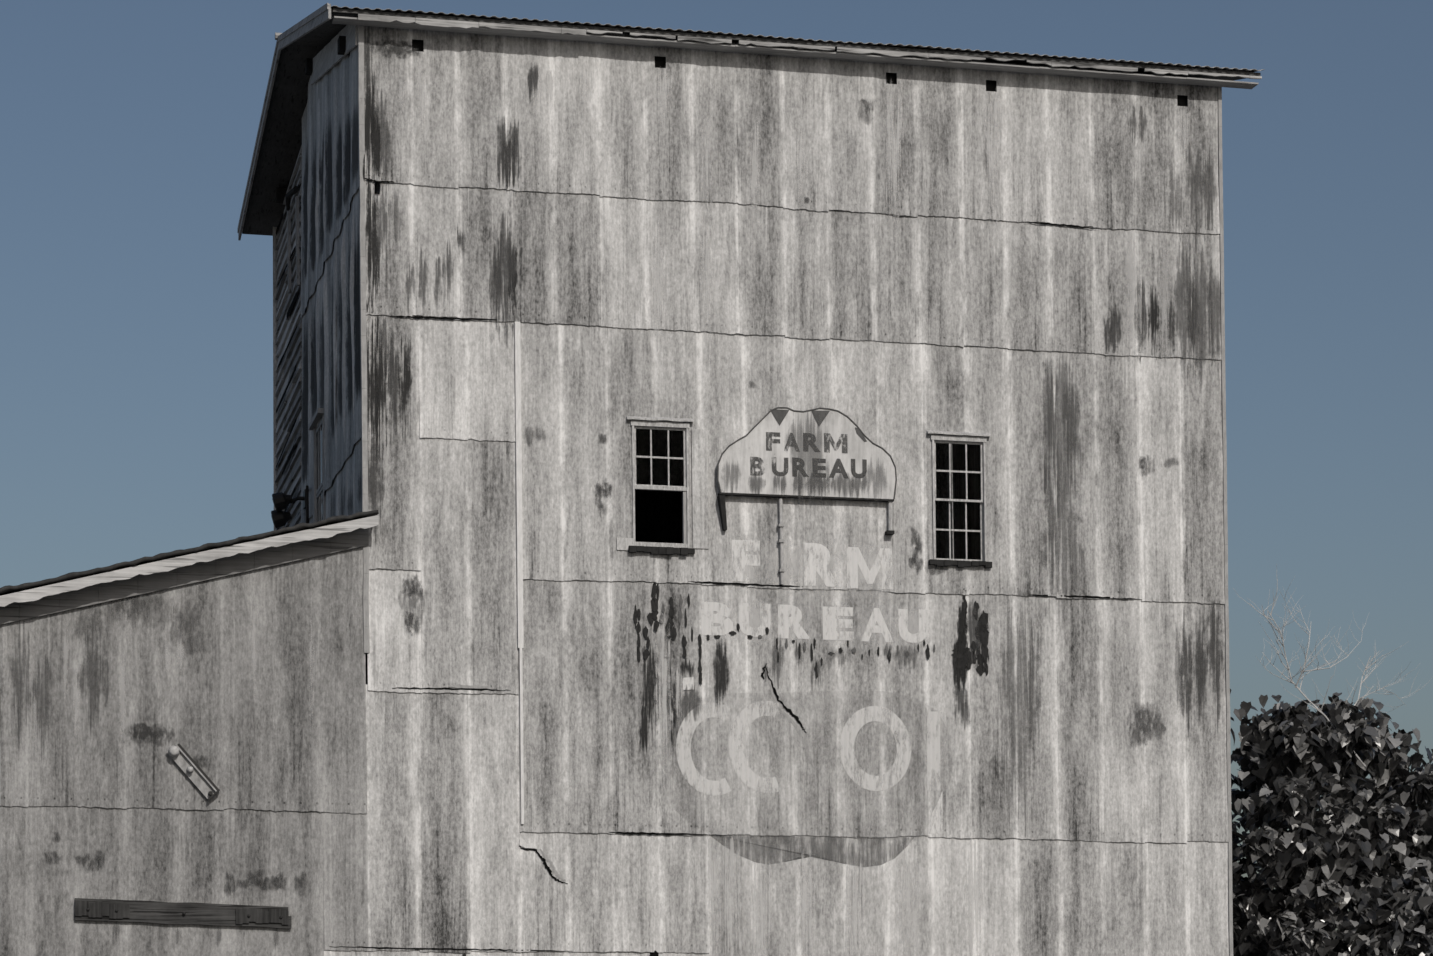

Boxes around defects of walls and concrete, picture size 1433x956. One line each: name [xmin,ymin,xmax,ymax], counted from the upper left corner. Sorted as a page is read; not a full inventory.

corrosion [528,67,538,102]
corrosion [497,117,520,187]
corrosion [301,27,412,542]
corrosion [952,589,989,726]
crack [761,663,813,768]
crack [329,839,568,952]